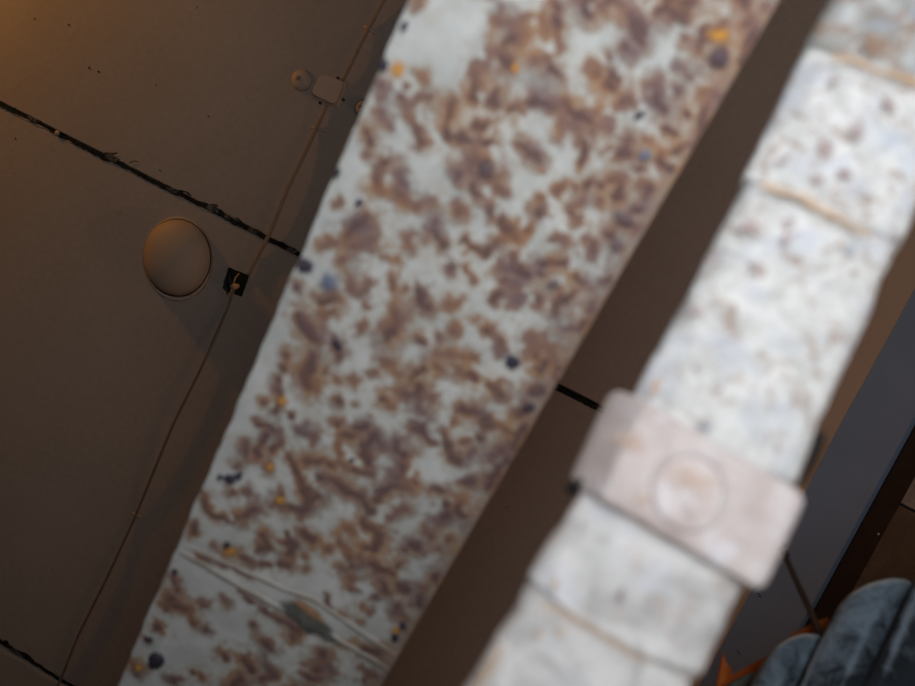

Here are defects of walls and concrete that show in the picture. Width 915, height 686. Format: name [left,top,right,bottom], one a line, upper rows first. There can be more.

crack [0,102,303,258]
rust [141,0,779,686]
crack [554,385,602,412]
crack [0,639,74,686]